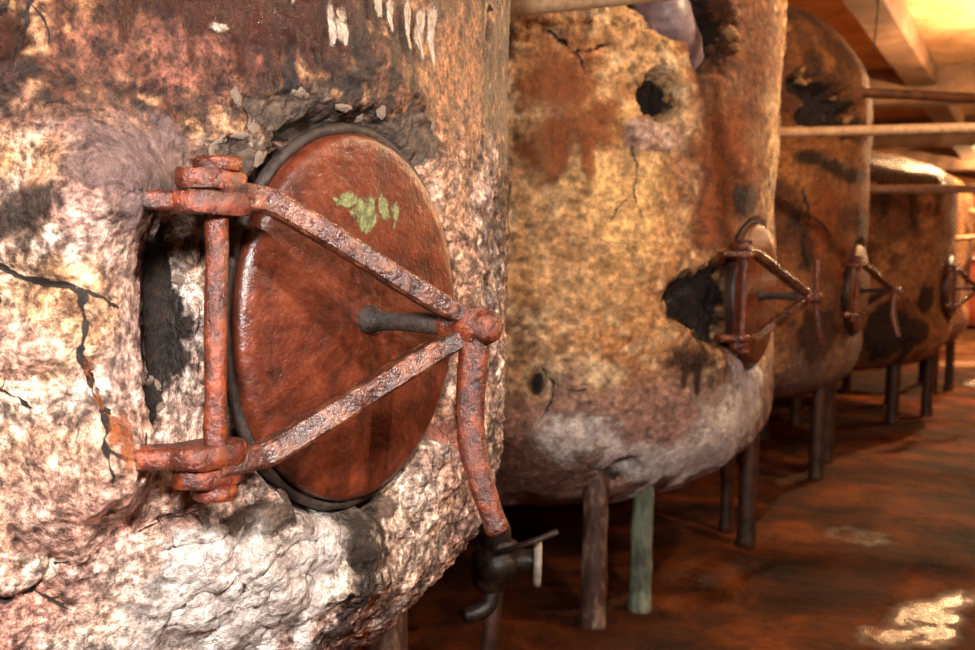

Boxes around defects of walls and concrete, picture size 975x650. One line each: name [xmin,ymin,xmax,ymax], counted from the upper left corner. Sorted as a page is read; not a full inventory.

spalling [635,74,684,123]
crack [0,263,148,484]
spalling [139,225,196,426]
spalling [661,258,726,360]